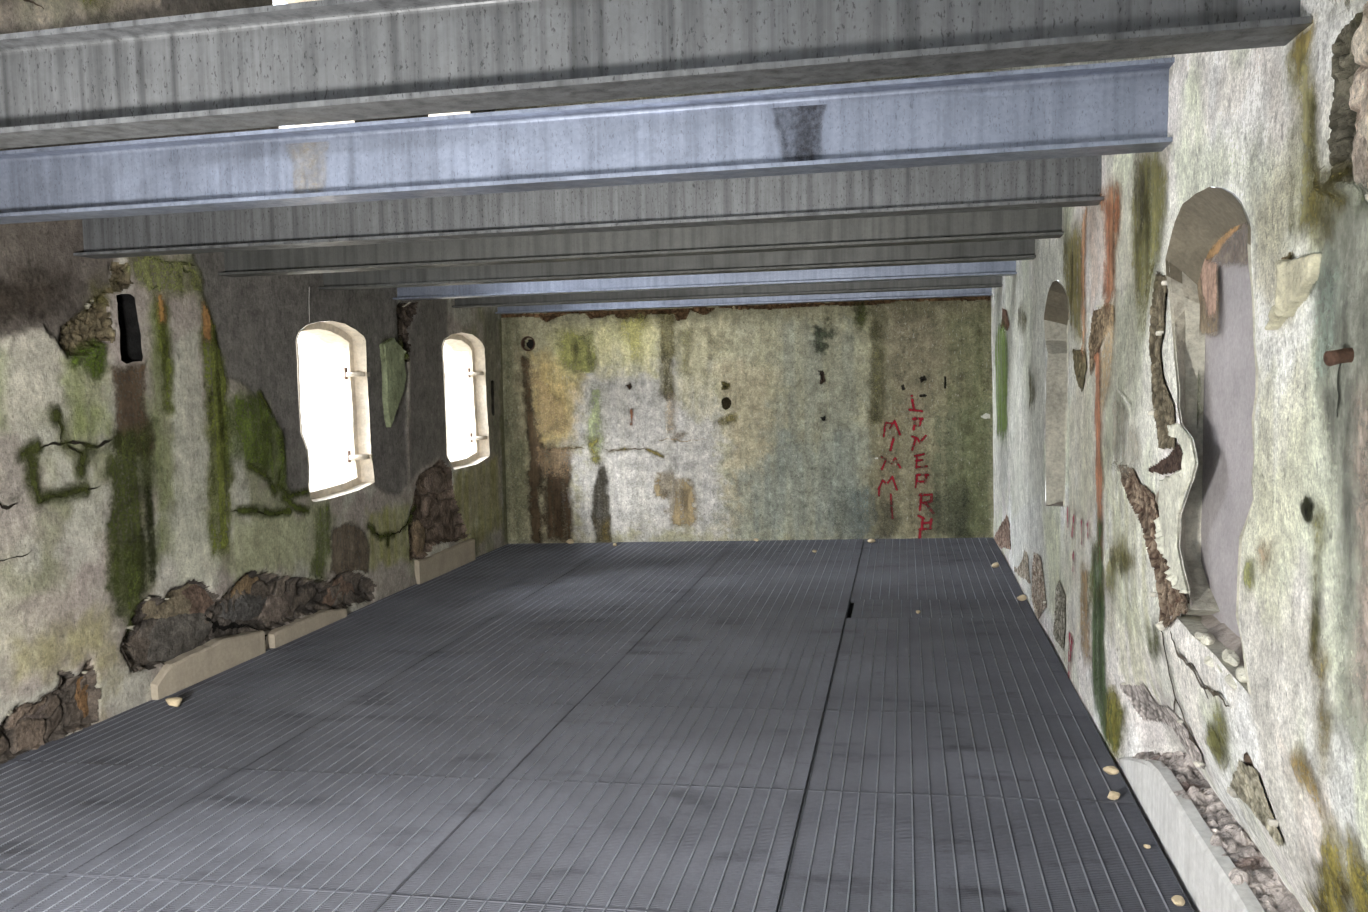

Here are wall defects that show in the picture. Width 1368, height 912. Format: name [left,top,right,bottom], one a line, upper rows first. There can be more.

spalling [1349,1,1368,202]
leakage [111,363,154,455]
leakage [521,356,573,543]
spalling [1072,303,1114,392]
rust [1081,185,1119,544]
leakage [590,466,611,543]
spalling [120,570,377,673]
spalling [0,658,101,765]